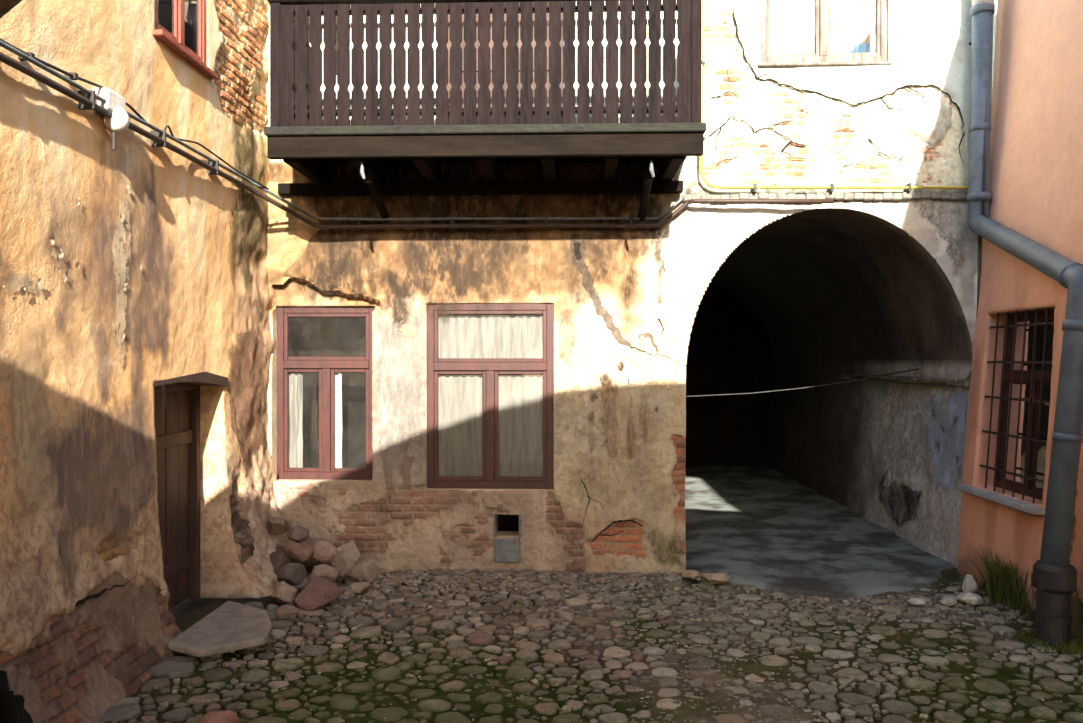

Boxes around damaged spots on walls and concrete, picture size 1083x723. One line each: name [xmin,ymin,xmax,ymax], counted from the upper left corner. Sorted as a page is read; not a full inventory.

flaking render [214,0,269,134]
flaking render [688,0,966,187]
crack [709,7,965,174]
damp [13,166,172,581]
crack [570,233,683,362]
flaking render [274,481,646,573]
flaking render [0,526,183,723]